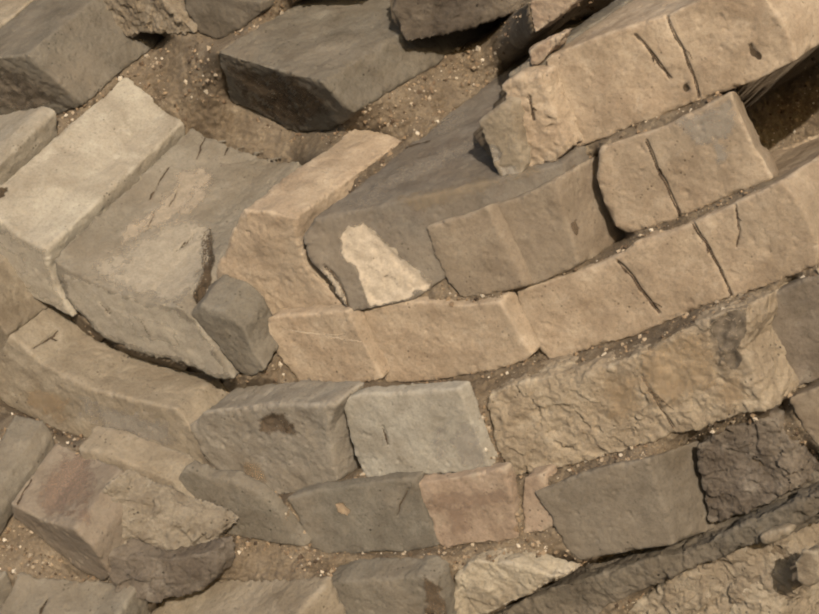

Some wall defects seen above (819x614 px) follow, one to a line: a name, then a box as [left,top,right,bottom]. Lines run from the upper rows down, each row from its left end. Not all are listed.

crack [634,34,670,79]
crack [668,20,700,98]
crack [645,141,732,296]
crack [617,261,662,313]